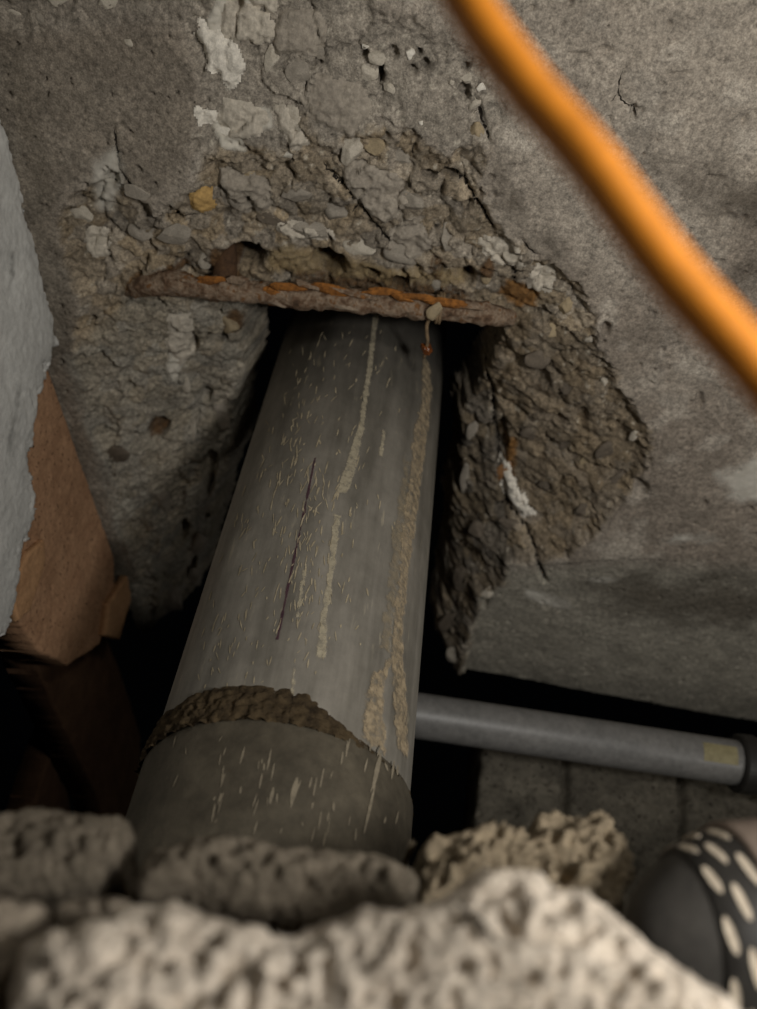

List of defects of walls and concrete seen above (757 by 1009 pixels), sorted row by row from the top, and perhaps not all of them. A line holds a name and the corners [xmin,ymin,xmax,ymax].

spalling [0,0,655,676]
rust [296,257,465,299]